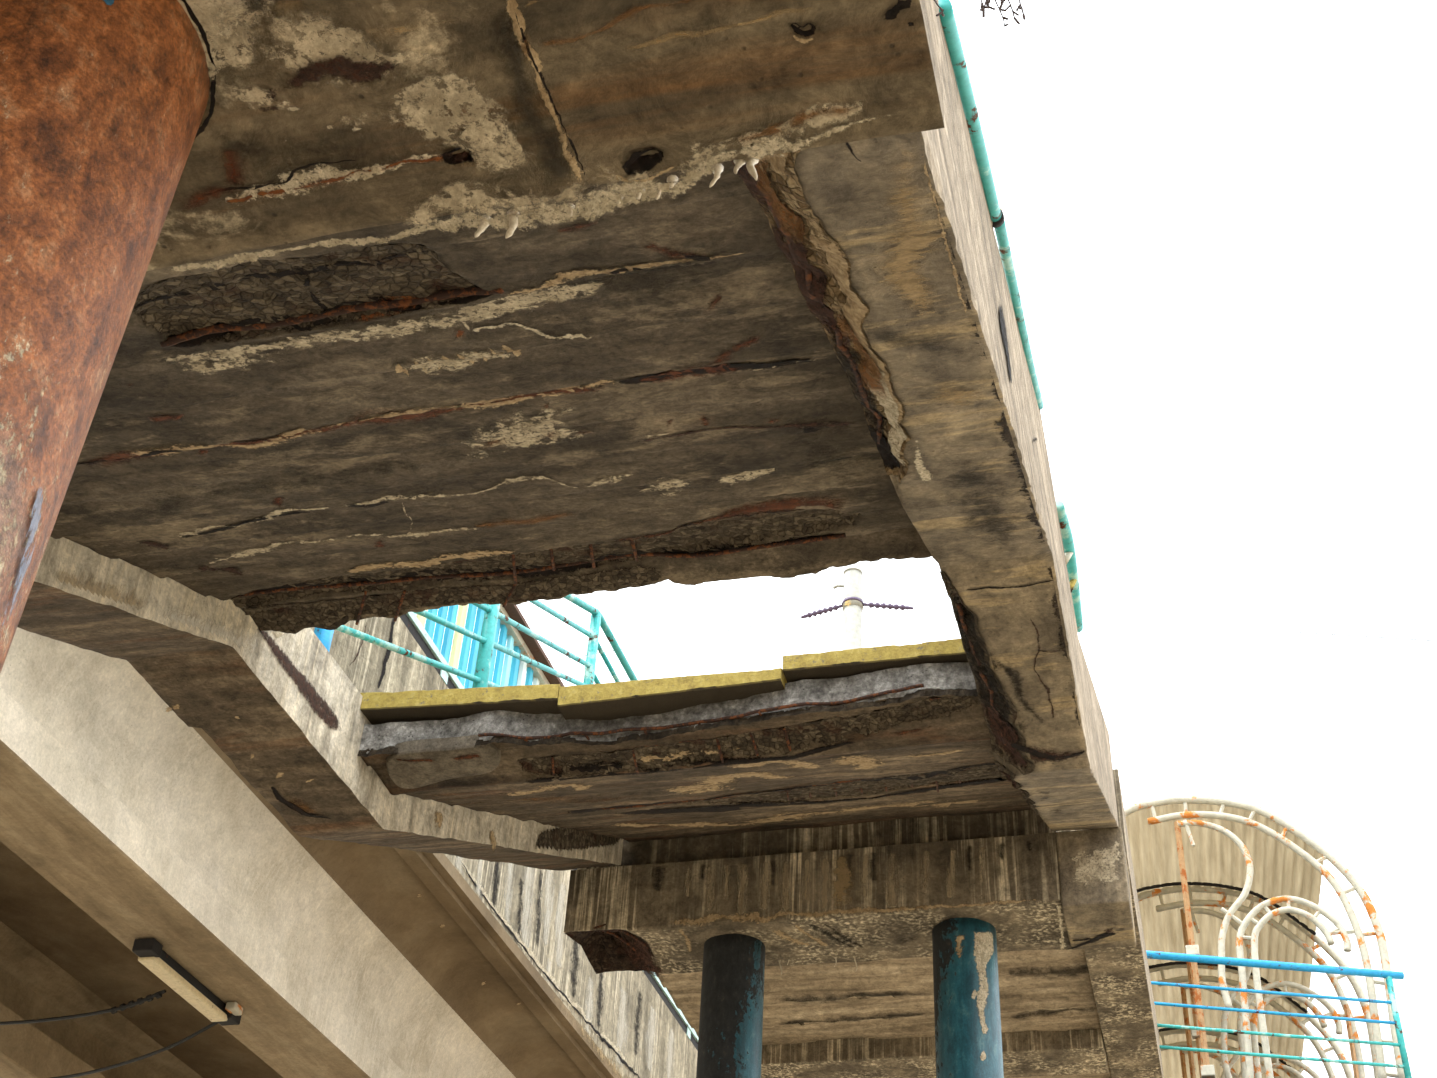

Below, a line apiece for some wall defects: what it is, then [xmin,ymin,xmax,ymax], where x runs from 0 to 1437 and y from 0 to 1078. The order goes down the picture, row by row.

leakage [178,0,443,76]
crack [497,0,585,181]
spalling [615,149,674,184]
spalling [134,243,504,348]
spalling [730,150,911,483]
spalling [357,746,399,757]
spalling [223,496,860,730]
spalling [475,571,1039,851]
crack [967,580,1064,718]
peeling [956,932,994,1034]